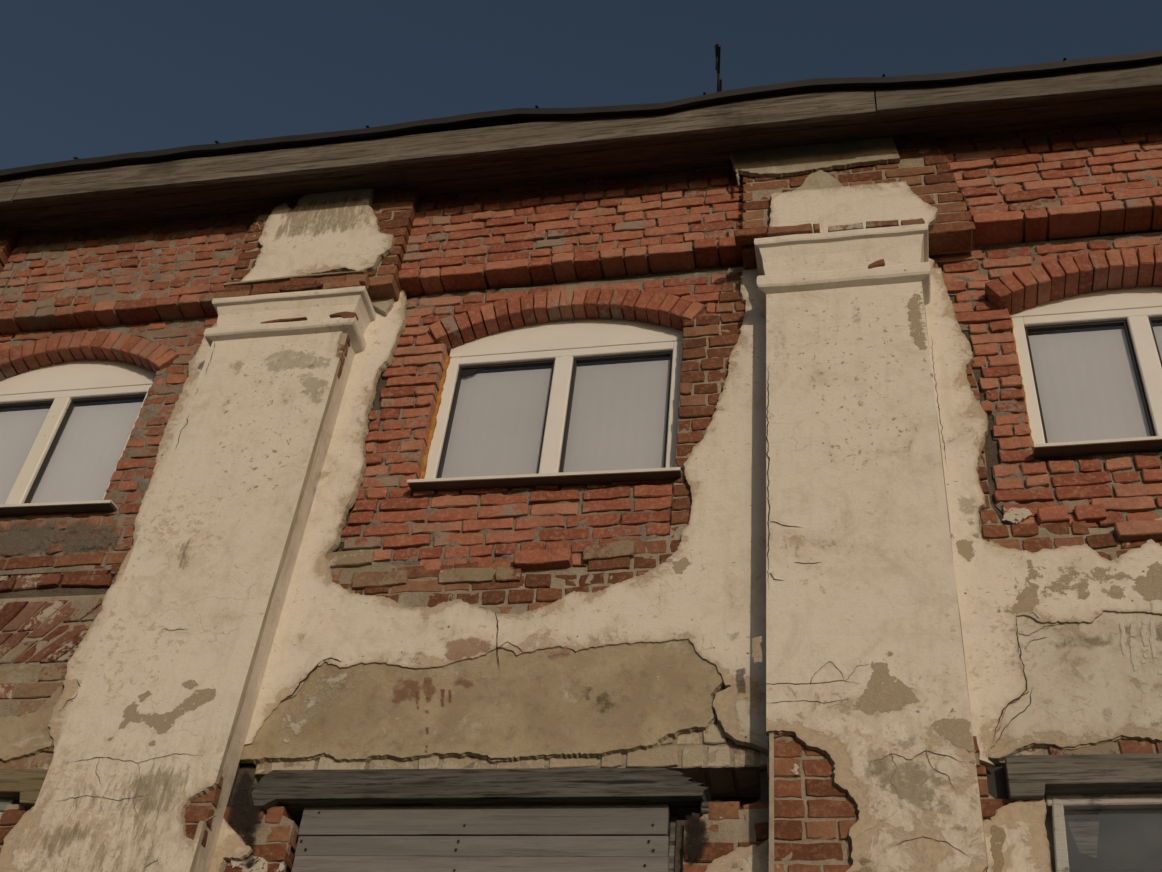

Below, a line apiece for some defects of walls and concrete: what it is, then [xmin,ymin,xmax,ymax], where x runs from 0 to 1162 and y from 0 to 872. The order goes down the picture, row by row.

flaking render [217,137,1162,621]
flaking render [0,552,128,577]
flaking render [0,594,105,717]
peeling [108,680,216,746]
crack [755,661,868,703]
peeling [846,652,920,715]
crack [993,612,1068,742]
crack [61,753,196,818]
flaking render [182,770,300,872]
flaking render [255,685,873,872]
crack [873,750,958,794]
flaking render [931,708,1162,872]